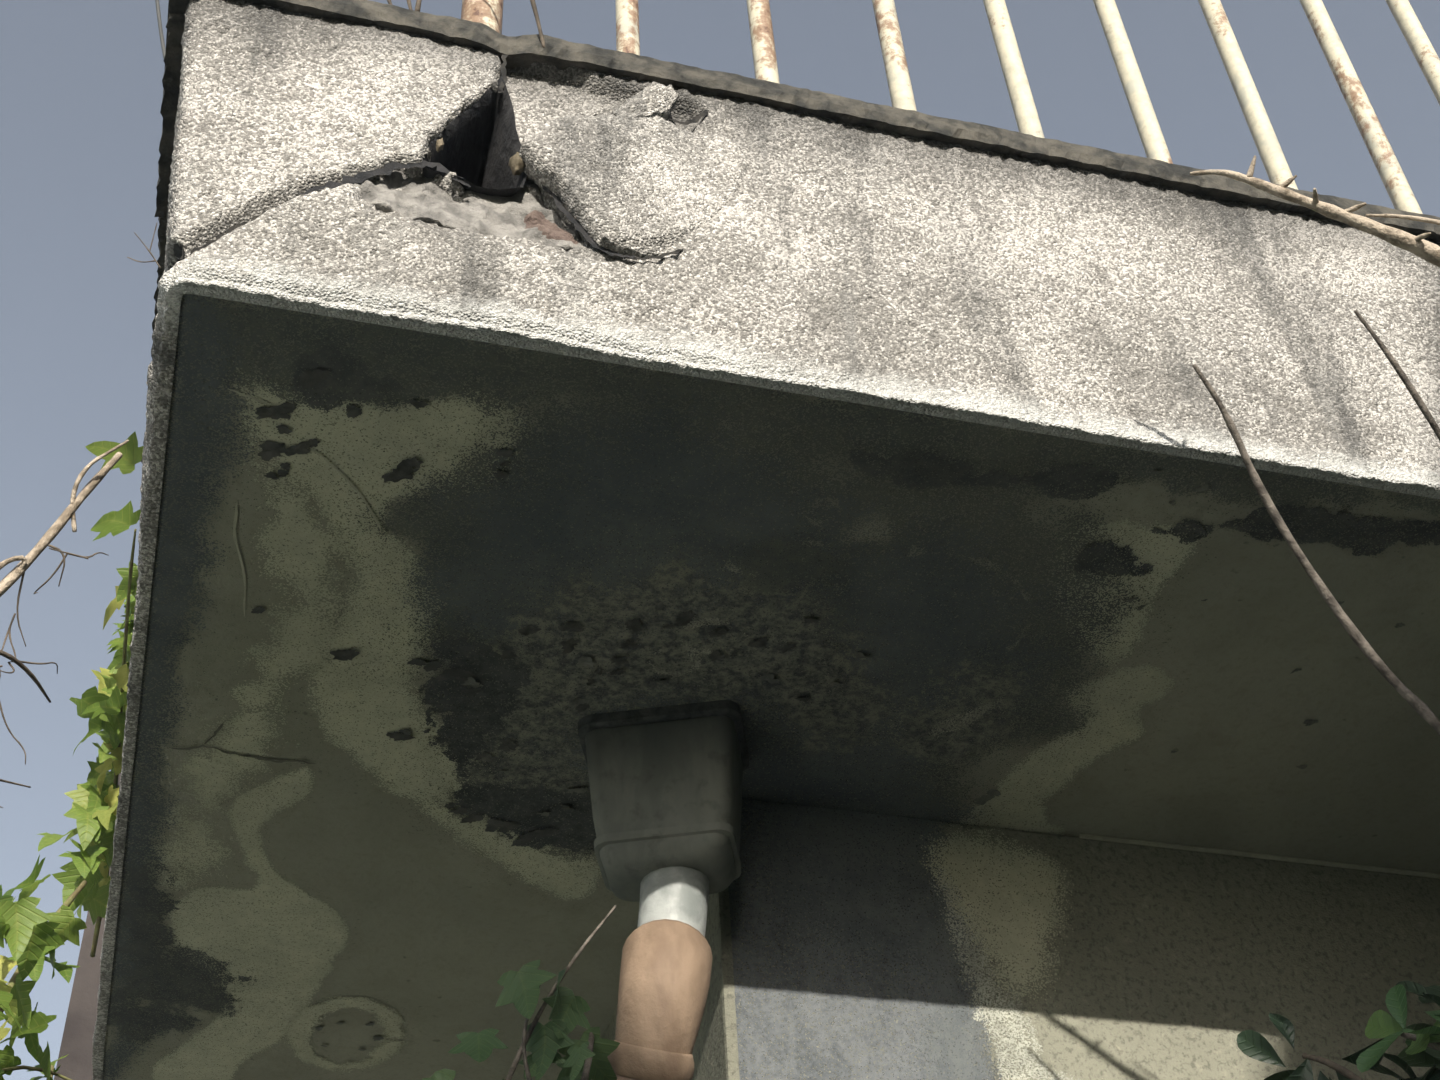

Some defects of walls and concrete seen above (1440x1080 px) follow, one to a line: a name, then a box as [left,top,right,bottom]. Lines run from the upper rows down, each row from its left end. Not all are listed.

crack [169,203,284,269]
spalling [298,77,749,259]
crack [621,249,684,261]
crack [670,110,709,125]
peeling [843,449,1124,502]
peeling [146,359,602,1080]
damp [102,294,1440,1080]
peeling [959,500,1440,835]